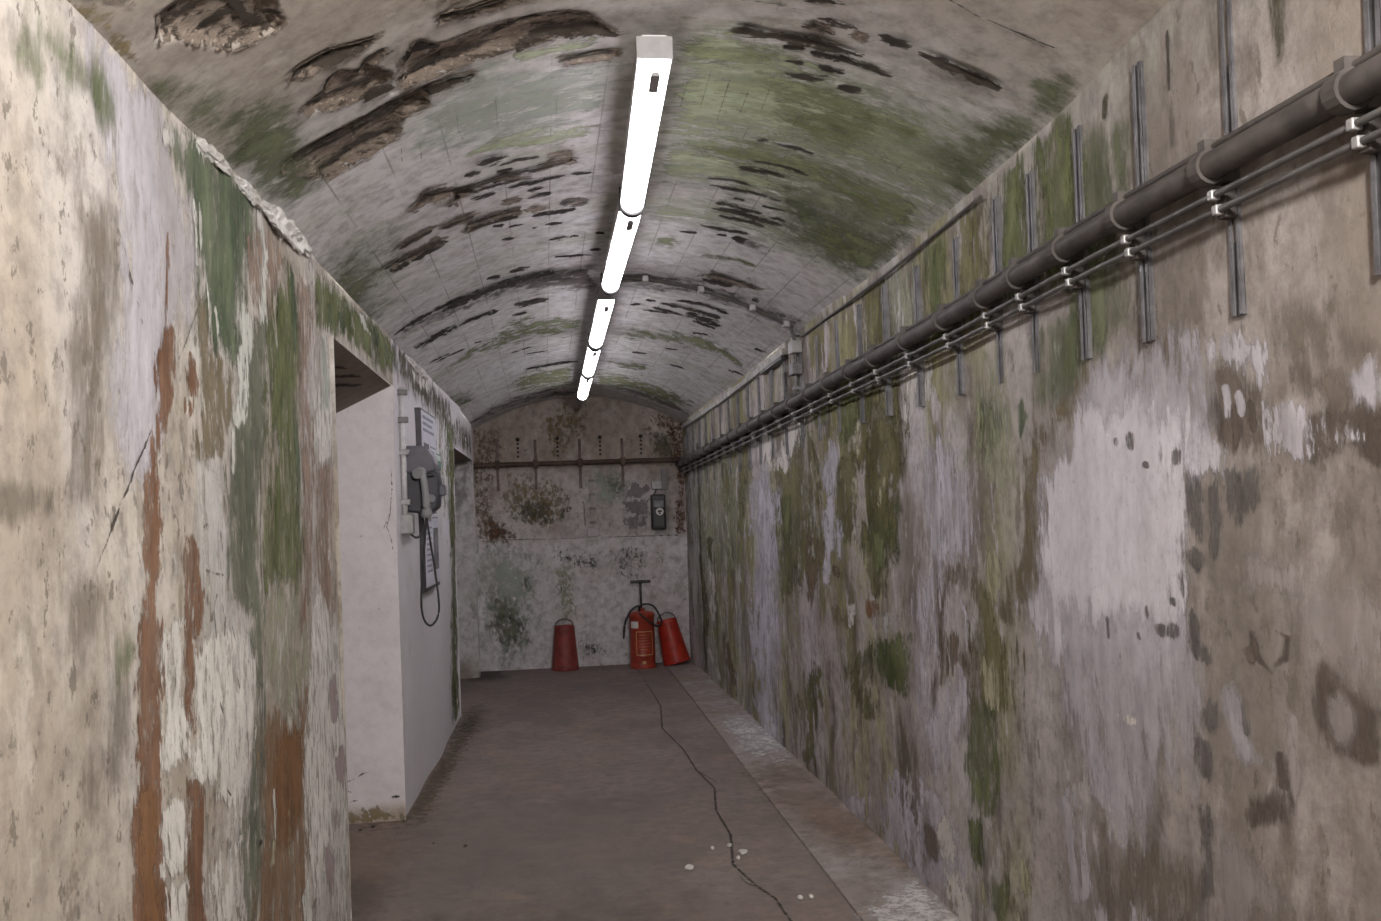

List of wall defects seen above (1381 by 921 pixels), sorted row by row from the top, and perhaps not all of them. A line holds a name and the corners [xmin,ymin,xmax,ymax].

spalling [155,0,288,52]
spalling [281,0,625,183]
water stain [193,219,283,475]
crack [103,429,152,551]
rust [130,233,208,921]
crack [638,670,793,921]
water stain [840,364,980,921]
water stain [998,361,1095,625]
water stain [1058,738,1214,921]
water stain [1194,698,1218,780]
water stain [1138,307,1381,670]